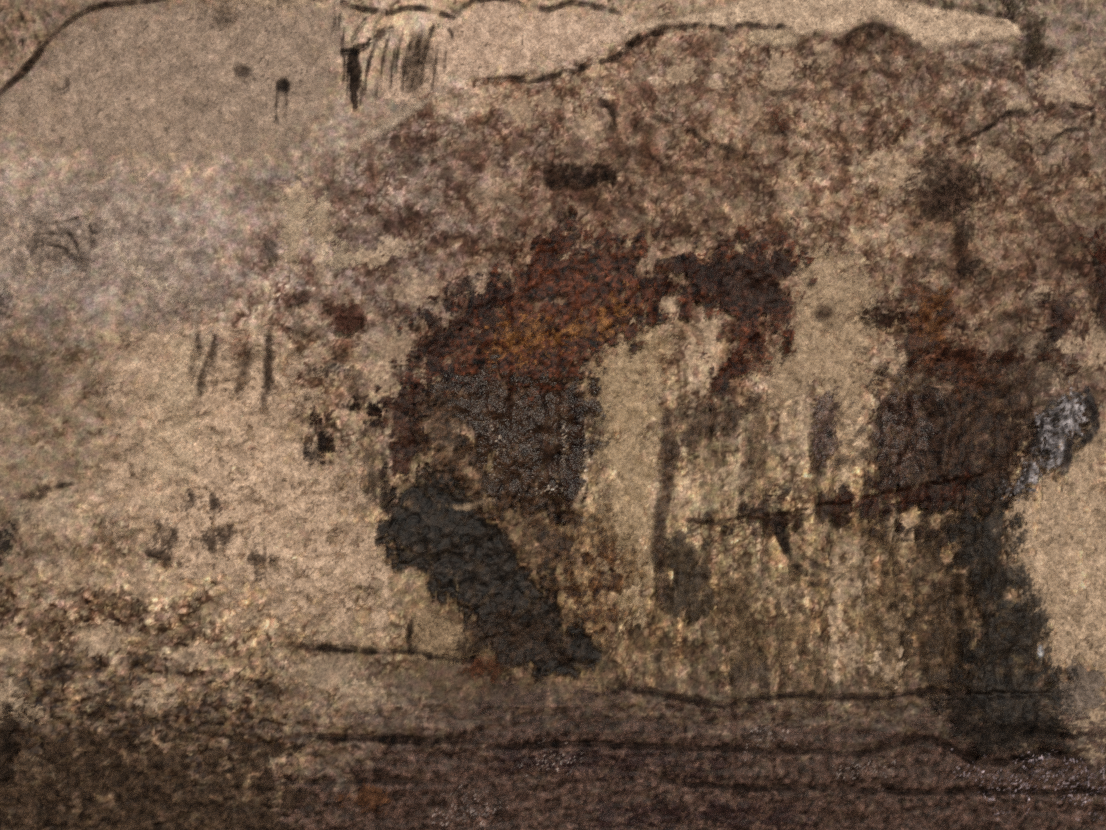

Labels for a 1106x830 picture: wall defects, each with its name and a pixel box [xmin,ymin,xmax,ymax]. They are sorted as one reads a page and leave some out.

crack [0,0,155,92]
crack [340,0,620,36]
crack [488,22,792,82]
crack [834,22,899,44]
crack [926,0,1006,17]
crack [770,87,798,95]
crack [586,97,750,158]
corrosion [702,225,1106,547]
corrosion [310,201,818,647]
crack [685,515,745,525]
leakage [0,382,1106,830]